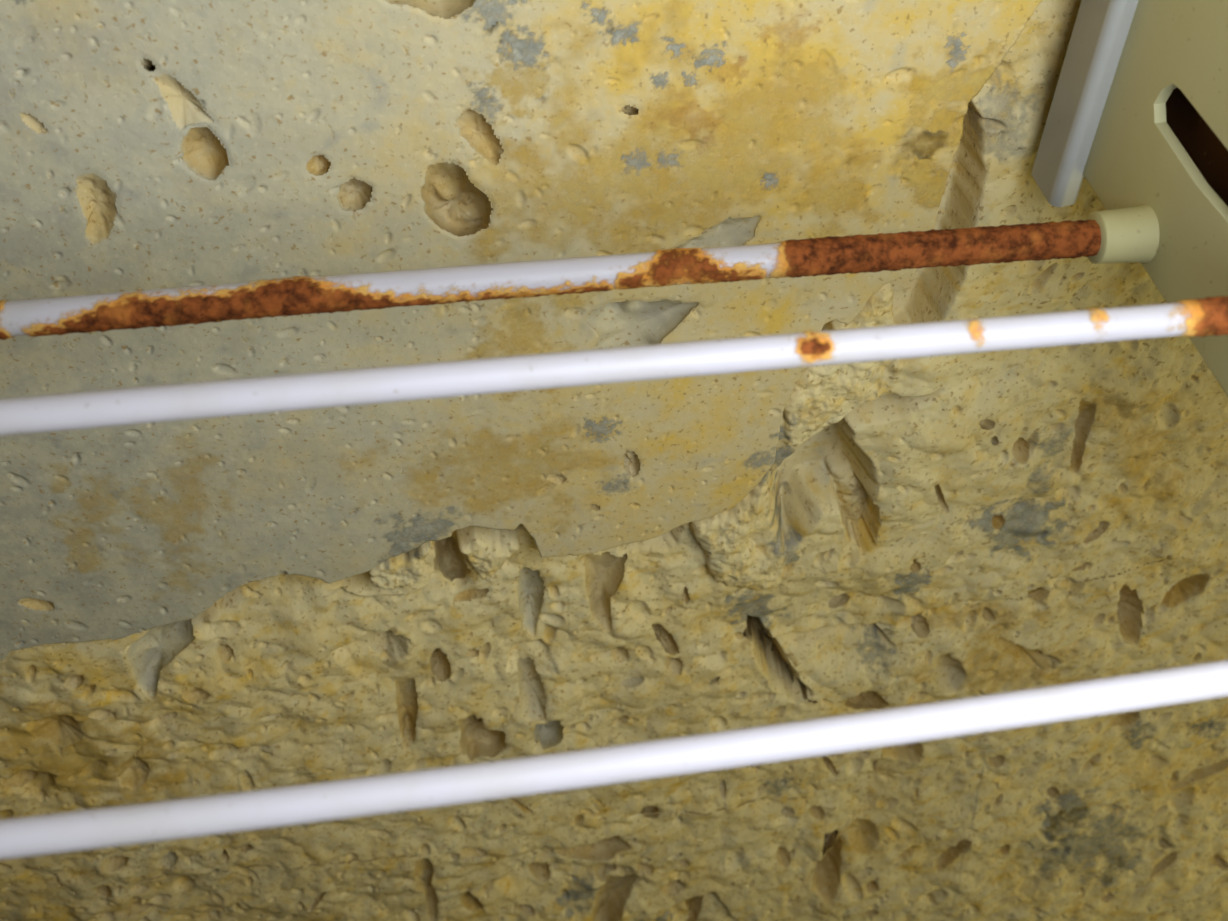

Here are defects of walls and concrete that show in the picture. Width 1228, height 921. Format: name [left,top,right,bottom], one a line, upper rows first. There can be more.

spalling [453,106,507,169]
spalling [934,0,1106,230]
spalling [72,169,121,249]
spalling [416,159,496,240]
rust [0,220,1101,340]
spalling [581,296,705,350]
rust [796,330,834,363]
rust [968,320,984,344]
spalling [822,256,1167,331]
rust [1178,296,1228,337]
spalling [0,335,1228,820]
spalling [0,697,1228,921]